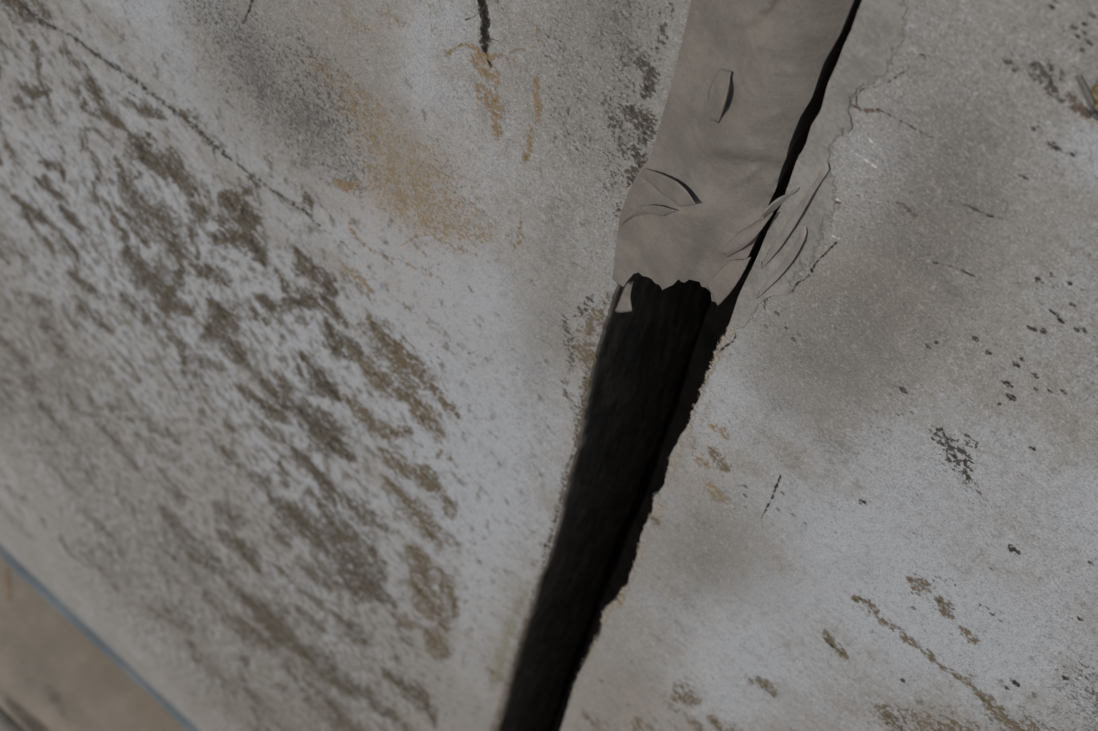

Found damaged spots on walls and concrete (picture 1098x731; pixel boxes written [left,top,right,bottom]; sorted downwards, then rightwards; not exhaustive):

crack [465,0,498,67]
crack [16,0,357,255]
peeling [1075,75,1098,124]
crack [764,242,837,310]
damp [0,0,462,731]
crack [761,475,781,519]
damp [823,629,849,660]
damp [907,574,979,645]
damp [851,594,1062,731]
damp [1055,652,1098,731]